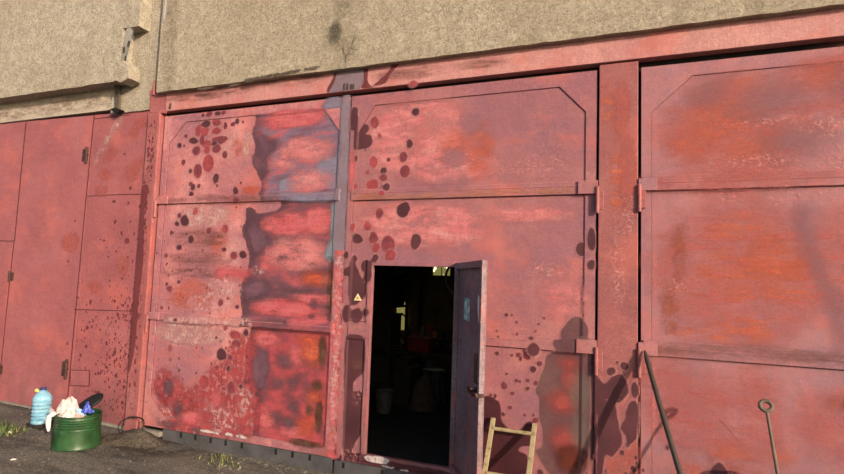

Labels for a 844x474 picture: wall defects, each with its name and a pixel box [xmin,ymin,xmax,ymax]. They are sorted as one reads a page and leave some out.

peeling [200,388,252,439]